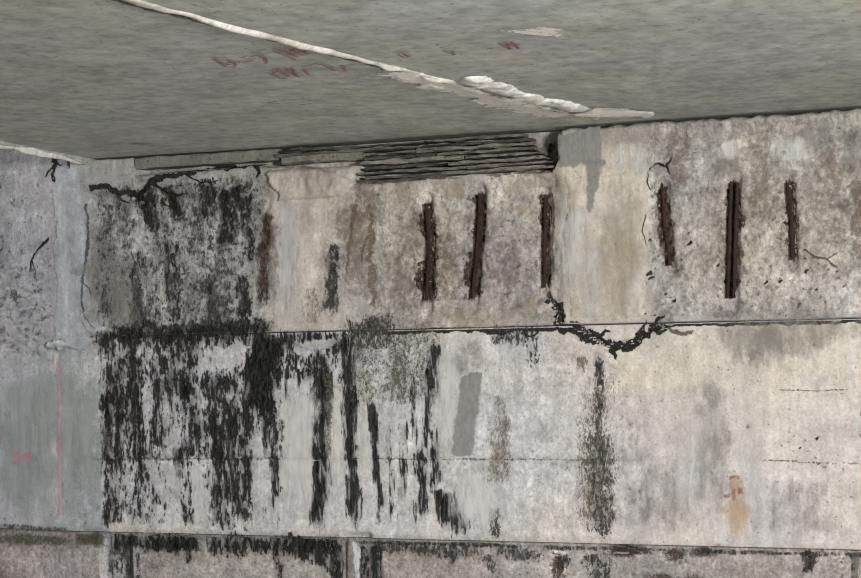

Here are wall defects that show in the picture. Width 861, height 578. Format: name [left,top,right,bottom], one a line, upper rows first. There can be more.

crack [112,0,218,28]
crack [330,55,401,72]
crack [550,193,568,270]
crack [804,249,838,268]
crack [384,292,861,360]
leakage [0,174,861,578]